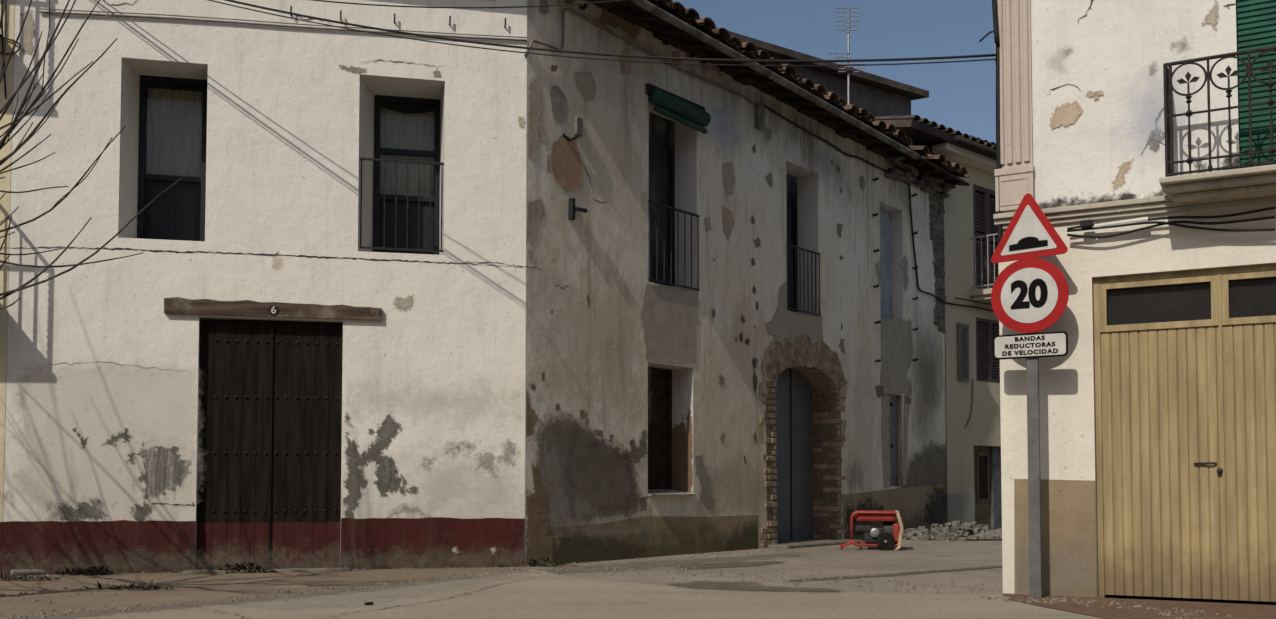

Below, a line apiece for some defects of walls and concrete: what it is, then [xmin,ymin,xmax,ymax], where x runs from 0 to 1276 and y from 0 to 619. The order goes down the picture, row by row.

flaking render [518,65,596,191]
flaking render [1049,91,1104,130]
flaking render [1112,159,1134,191]
flaking render [1147,129,1165,152]
flaking render [526,372,546,437]
flaking render [72,428,191,520]
flaking render [343,412,418,518]
flaking render [526,463,553,567]